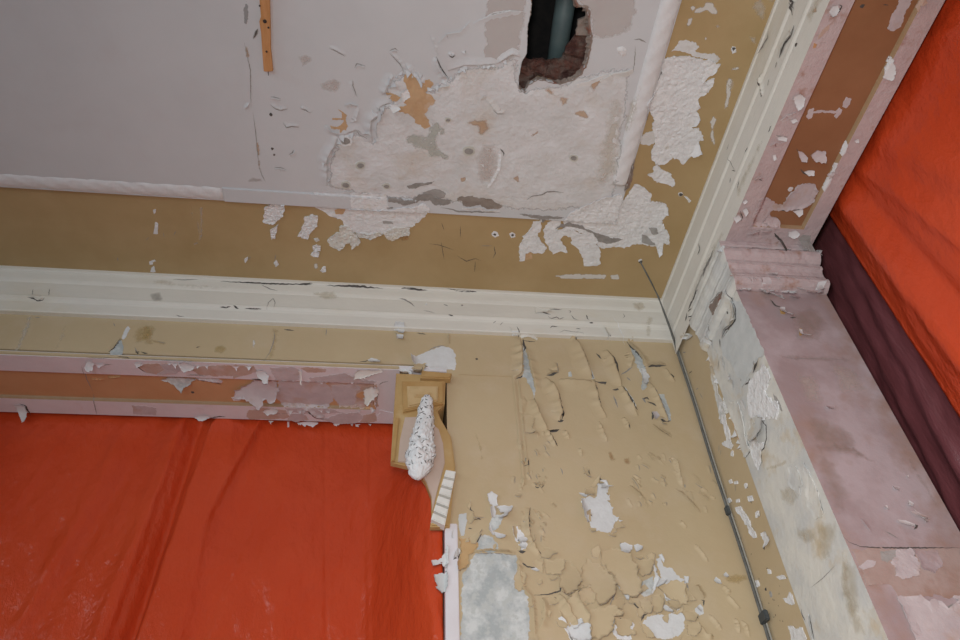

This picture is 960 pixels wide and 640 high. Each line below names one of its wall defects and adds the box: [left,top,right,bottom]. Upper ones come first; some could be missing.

peeling [316,0,636,212]
peeling [883,56,897,81]
spalling [327,225,410,251]
peeling [716,139,859,255]
peeling [84,323,394,427]
peeling [399,333,456,374]
peeling [495,321,570,446]
peeling [680,273,827,470]
peeling [431,491,528,593]
peeling [514,465,714,640]
peeling [728,479,769,549]
peeling [850,532,960,640]